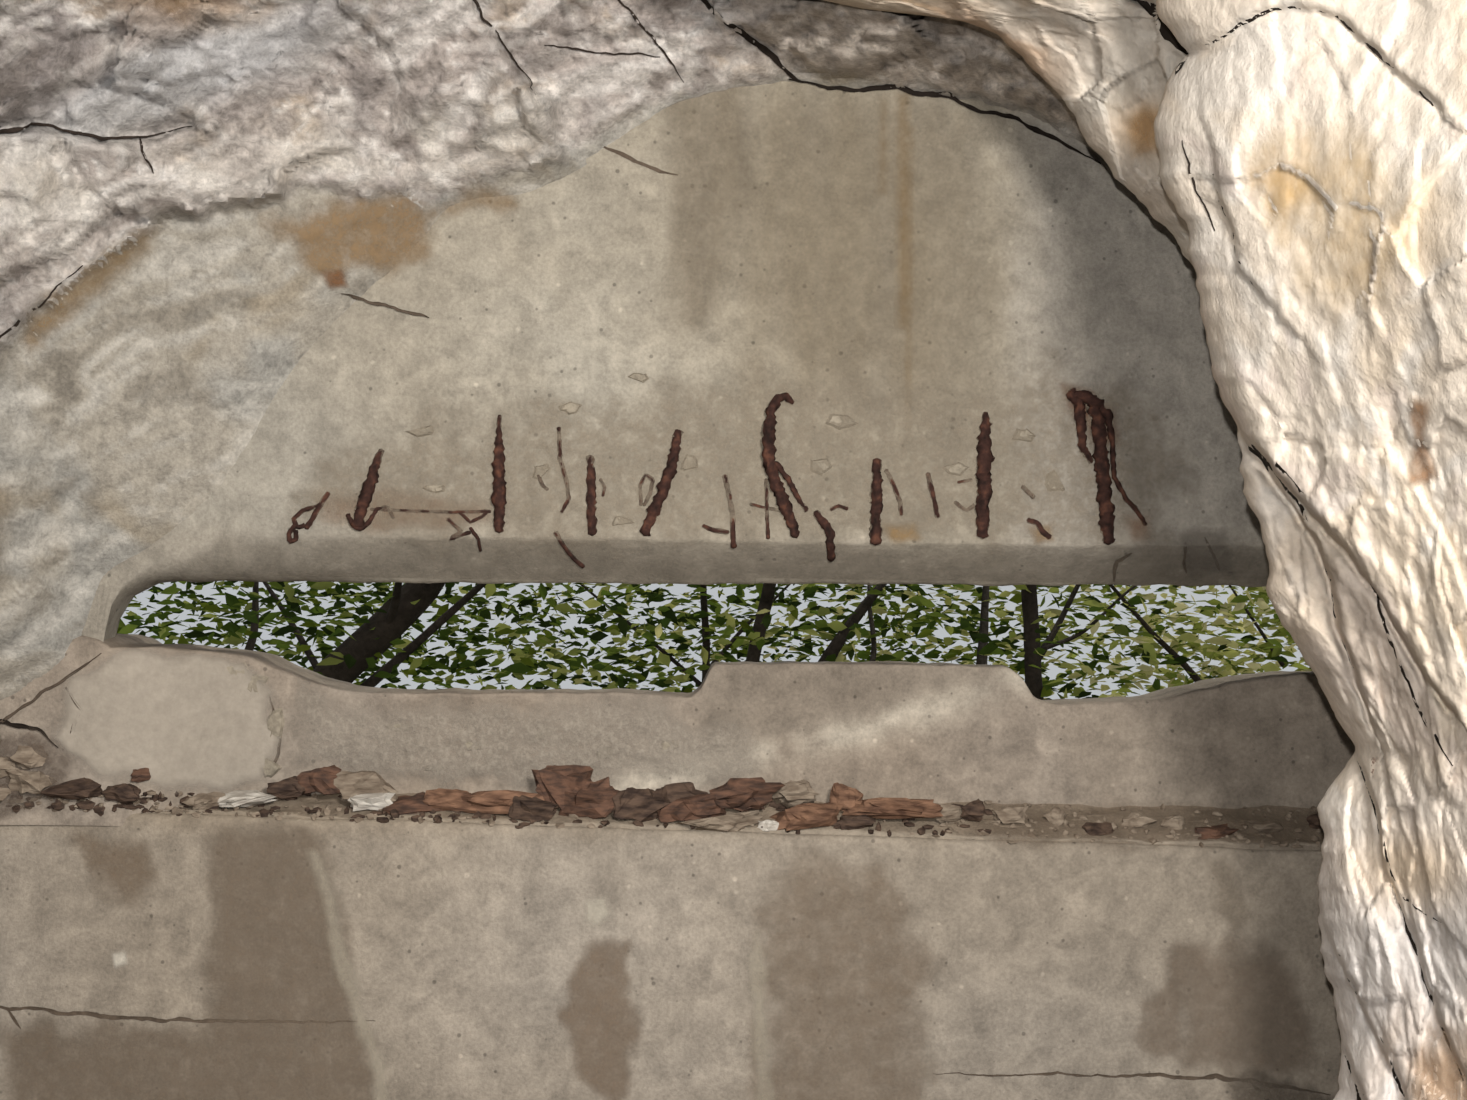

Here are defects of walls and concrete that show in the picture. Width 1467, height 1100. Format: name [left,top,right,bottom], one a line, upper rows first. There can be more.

corrosion [346,449,395,531]
corrosion [491,414,507,533]
corrosion [639,429,684,536]
corrosion [762,392,836,562]
corrosion [975,412,995,539]
corrosion [1066,388,1147,545]
flaking render [0,650,285,814]
spalling [299,685,748,784]
crack [0,1006,374,1029]
water stain [10,830,380,1100]
water stain [560,946,637,1100]
crack [932,1056,1361,1100]